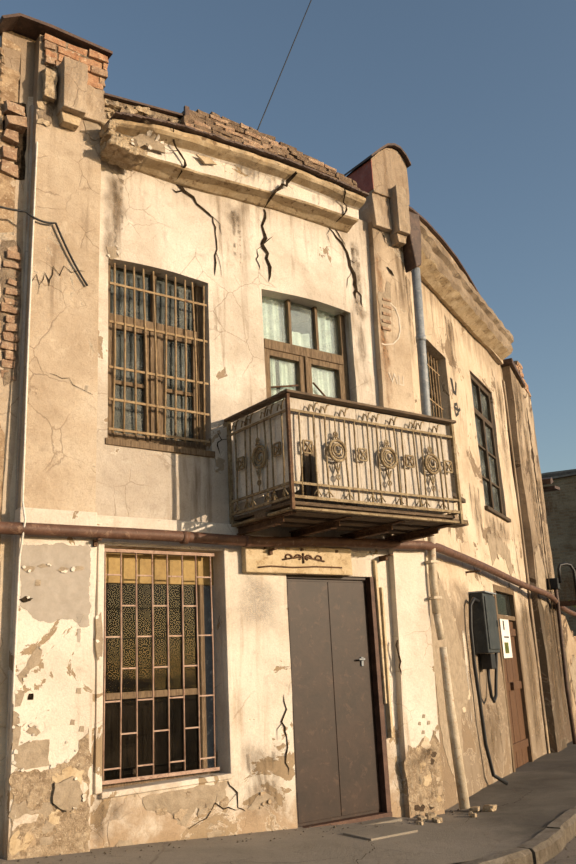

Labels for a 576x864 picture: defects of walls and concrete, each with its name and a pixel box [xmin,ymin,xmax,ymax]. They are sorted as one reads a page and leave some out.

crack [167,127,222,275]
crack [256,171,297,280]
crack [327,187,363,307]
spalling [6,646,93,860]
spalling [143,781,229,827]
crack [189,781,245,829]
crack [278,701,289,775]
peeling [403,572,471,815]